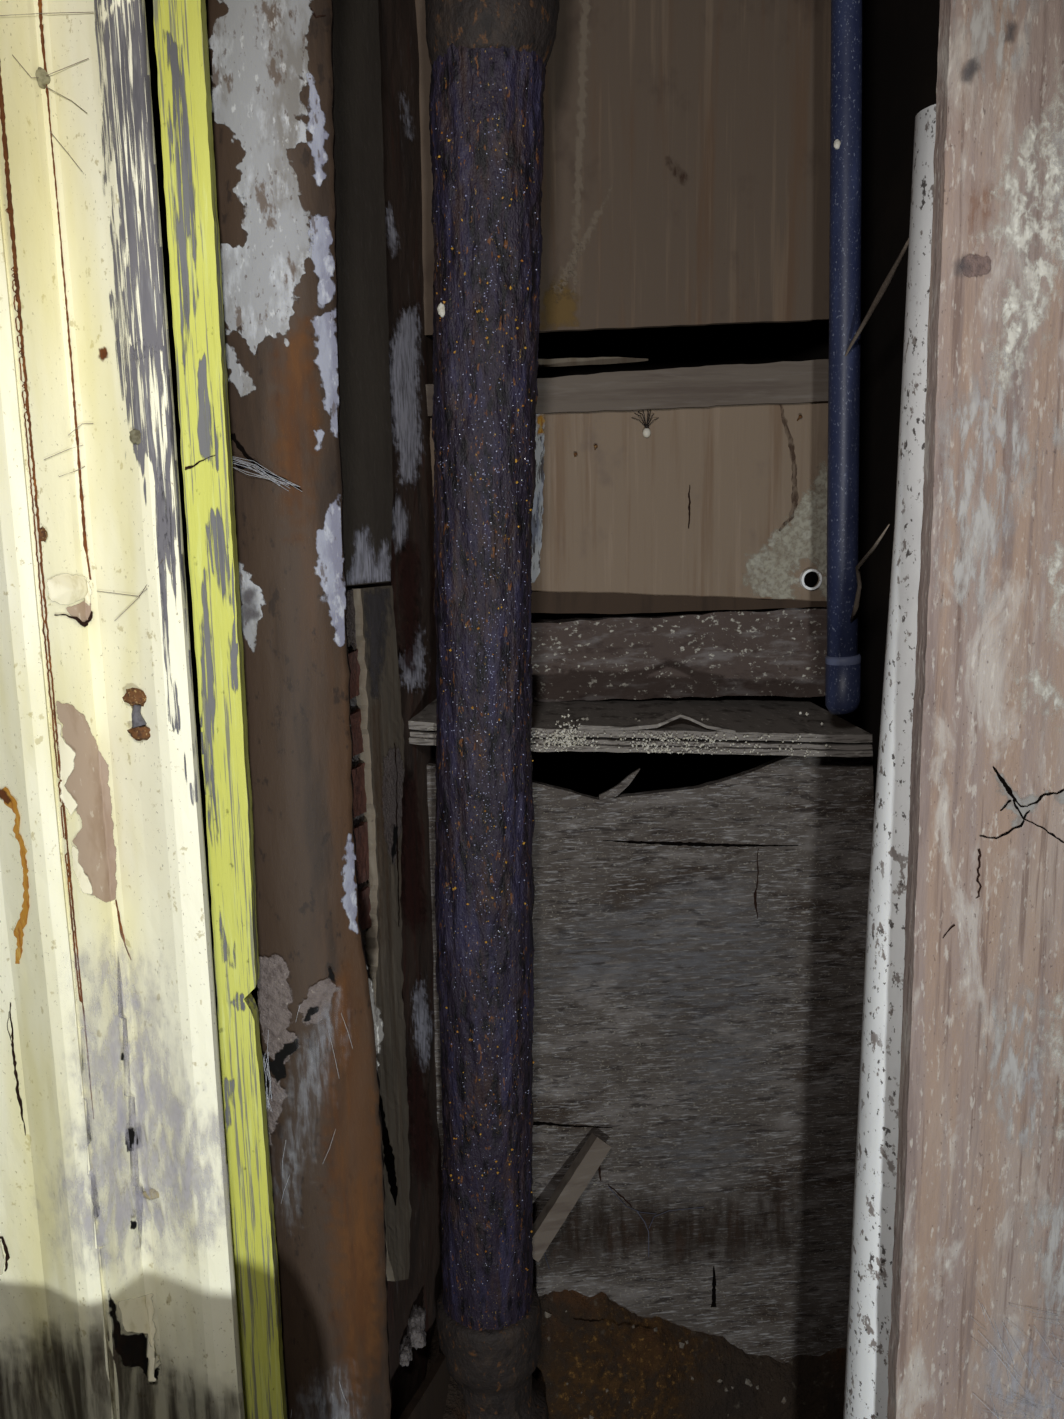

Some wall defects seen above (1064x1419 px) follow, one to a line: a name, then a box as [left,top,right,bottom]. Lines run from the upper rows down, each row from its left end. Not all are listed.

efflorescence [970,0,1027,73]
peeling [208,0,339,450]
damp [944,85,1064,614]
peeling [315,500,357,651]
peeling [56,701,117,902]
crack [976,766,1064,898]
spalling [231,954,339,1145]